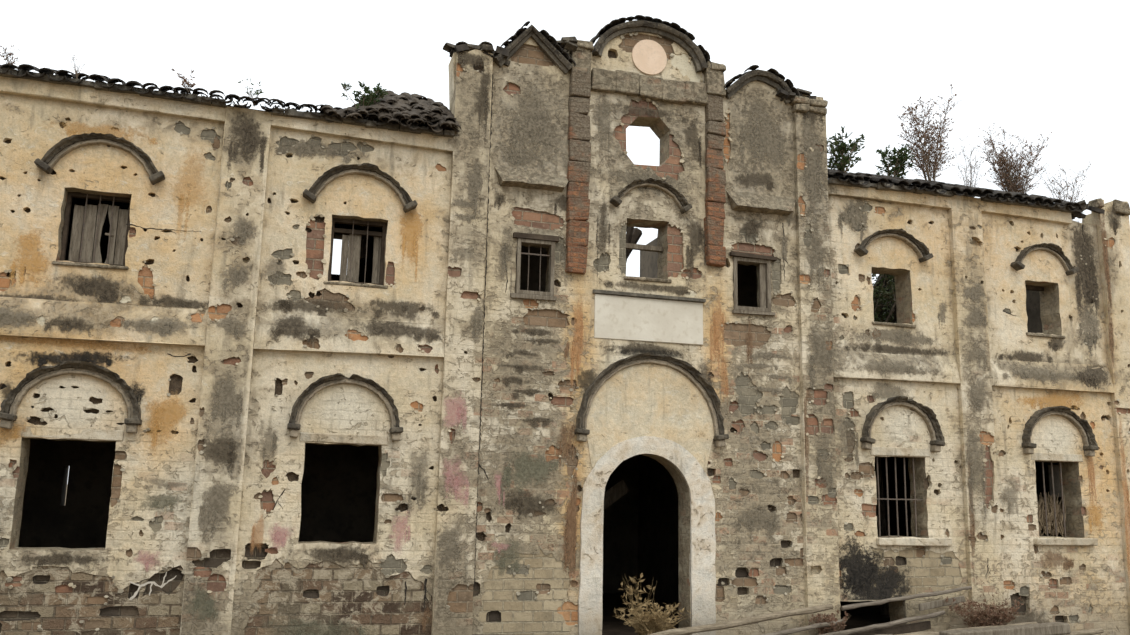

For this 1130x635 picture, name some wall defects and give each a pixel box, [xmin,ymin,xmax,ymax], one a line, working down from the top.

spalling [613,98,685,180]
spalling [110,260,156,327]
spalling [268,200,355,312]
damp [963,284,987,327]
damp [967,206,1121,457]
spalling [110,451,127,507]
damp [199,374,243,538]
spalling [254,460,299,517]
flaking render [707,372,963,604]
damp [967,434,987,548]
flaking render [0,543,433,635]
flaking render [446,549,578,635]